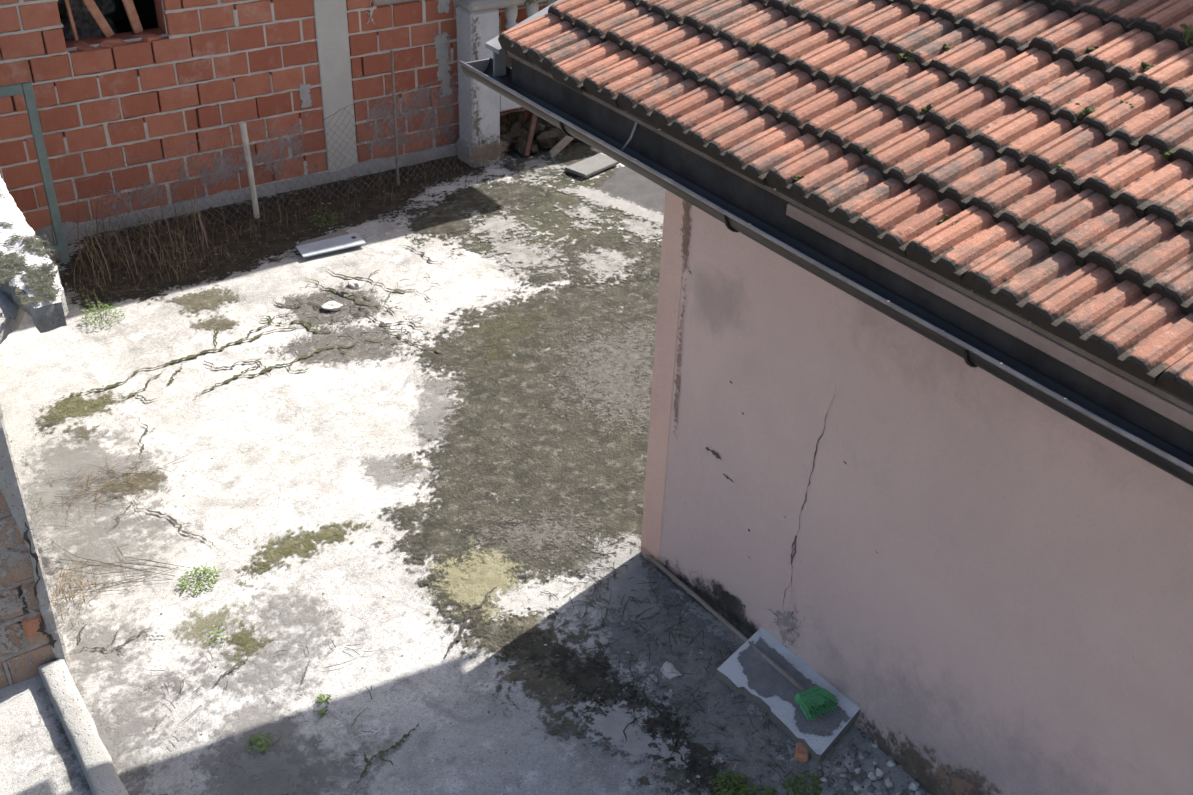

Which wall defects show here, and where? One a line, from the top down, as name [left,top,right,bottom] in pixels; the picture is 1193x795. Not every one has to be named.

damp [410,376,457,445]
crack [769,394,835,627]
spalling [21,614,42,638]
damp [485,532,857,795]
damp [858,716,999,795]